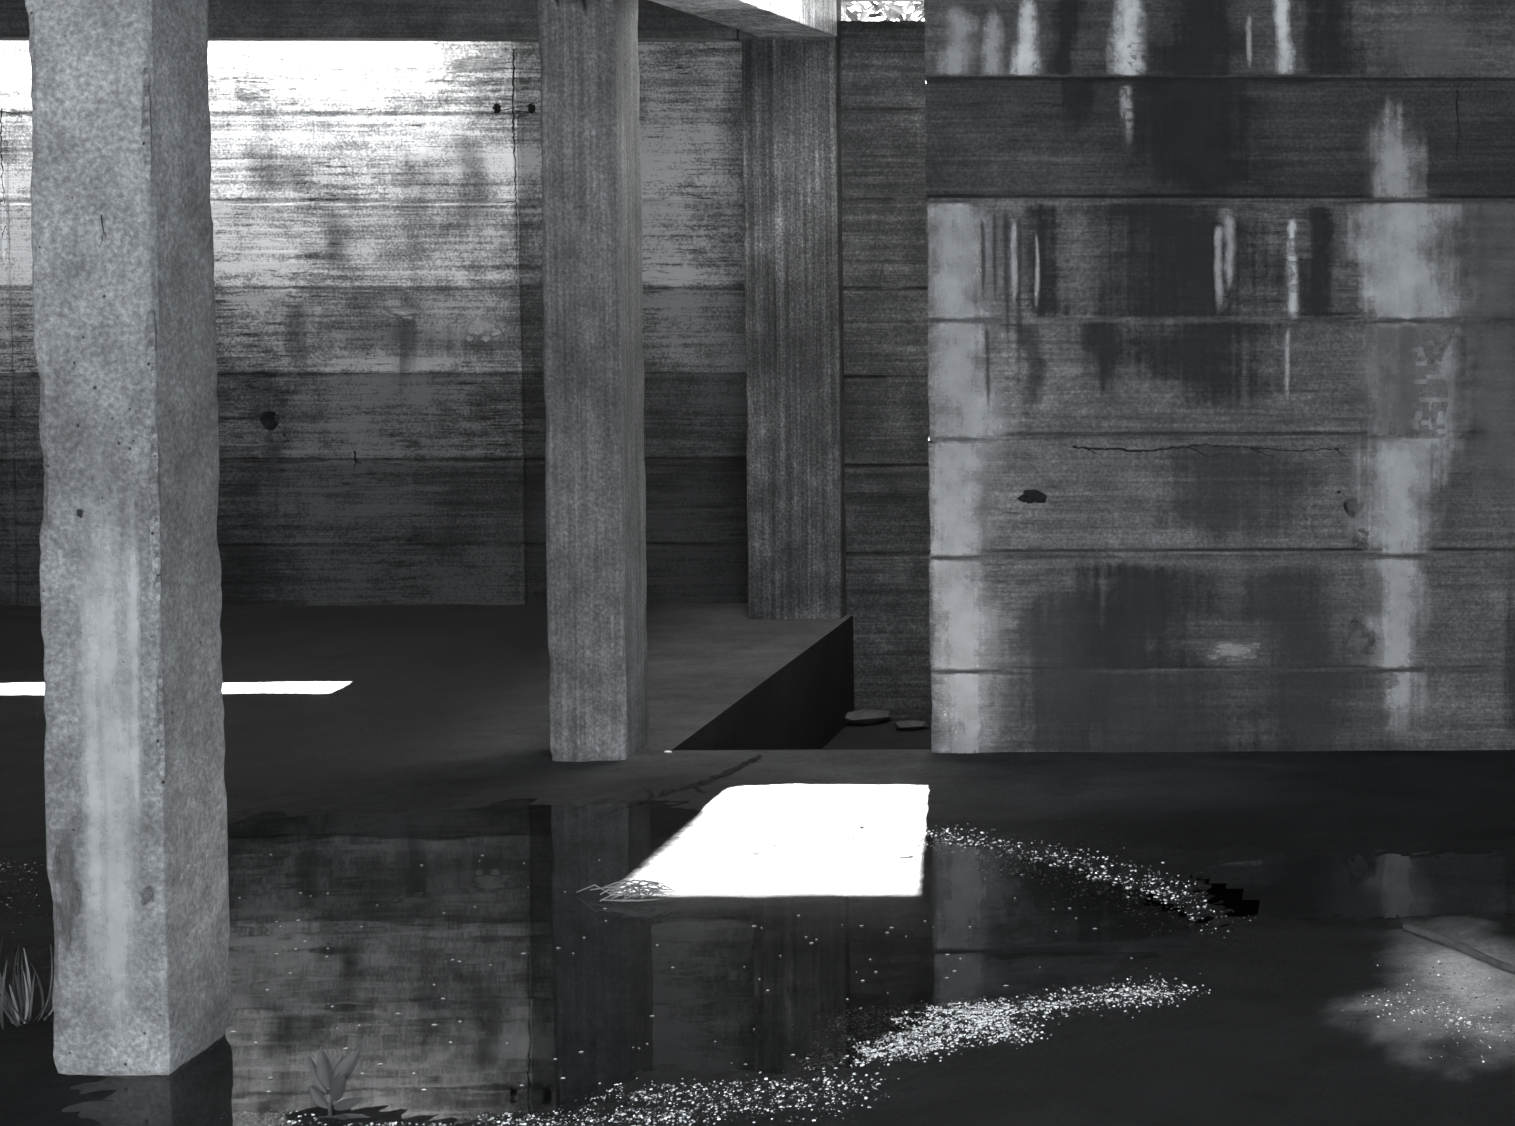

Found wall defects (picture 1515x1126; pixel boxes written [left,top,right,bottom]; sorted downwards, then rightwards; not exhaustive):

water stain [942,0,1093,125]
water stain [1082,0,1334,404]
water stain [928,203,1068,753]